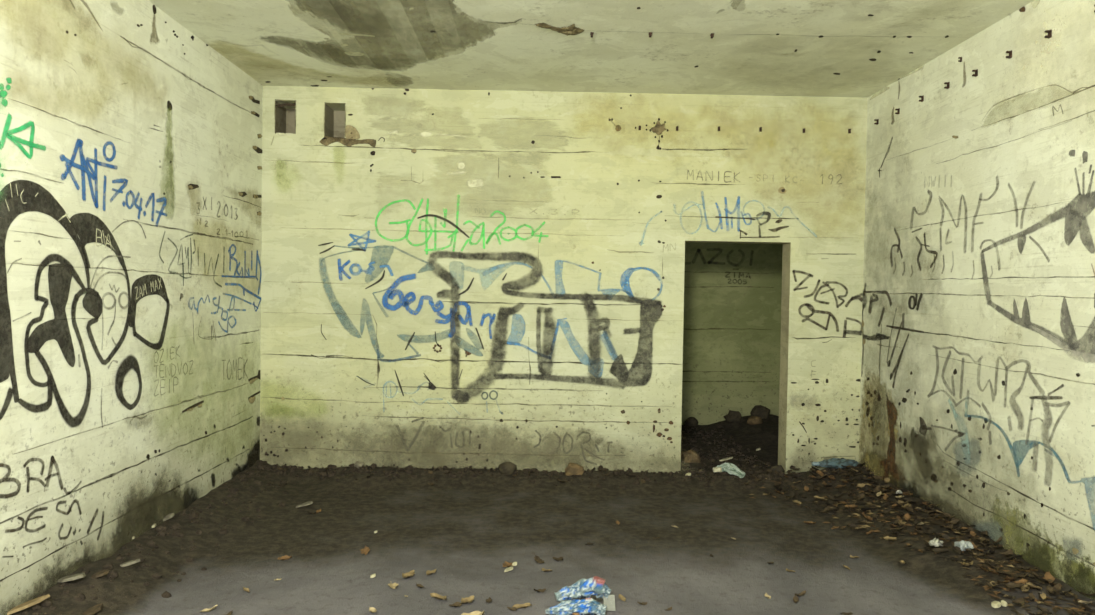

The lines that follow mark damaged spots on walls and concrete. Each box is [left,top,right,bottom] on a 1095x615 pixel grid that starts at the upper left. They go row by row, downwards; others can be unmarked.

corrosion [859,372,944,482]
leakage [3,473,199,615]
leakage [861,451,1095,598]